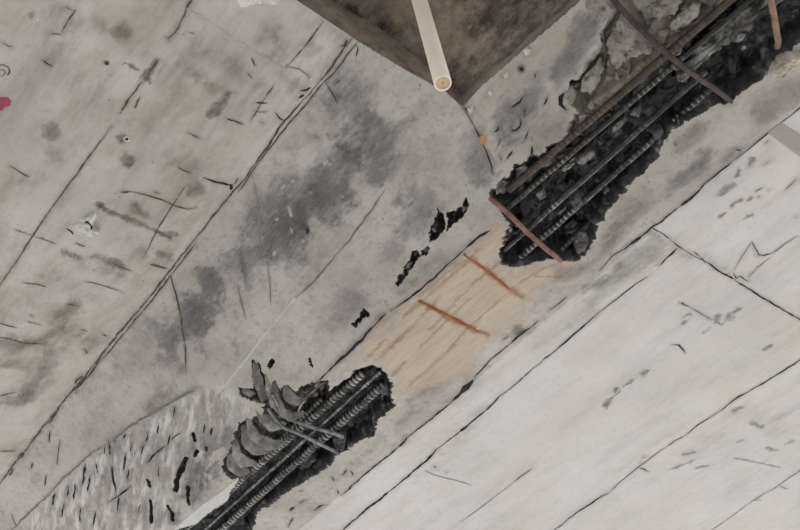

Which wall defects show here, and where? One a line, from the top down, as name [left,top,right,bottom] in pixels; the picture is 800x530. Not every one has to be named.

crack [166,0,194,40]
spalling [489,0,800,268]
crack [0,24,358,530]
crack [296,193,383,297]
spalling [395,197,469,286]
corrosion [364,231,550,388]
crack [317,107,800,530]
spalling [174,361,397,530]